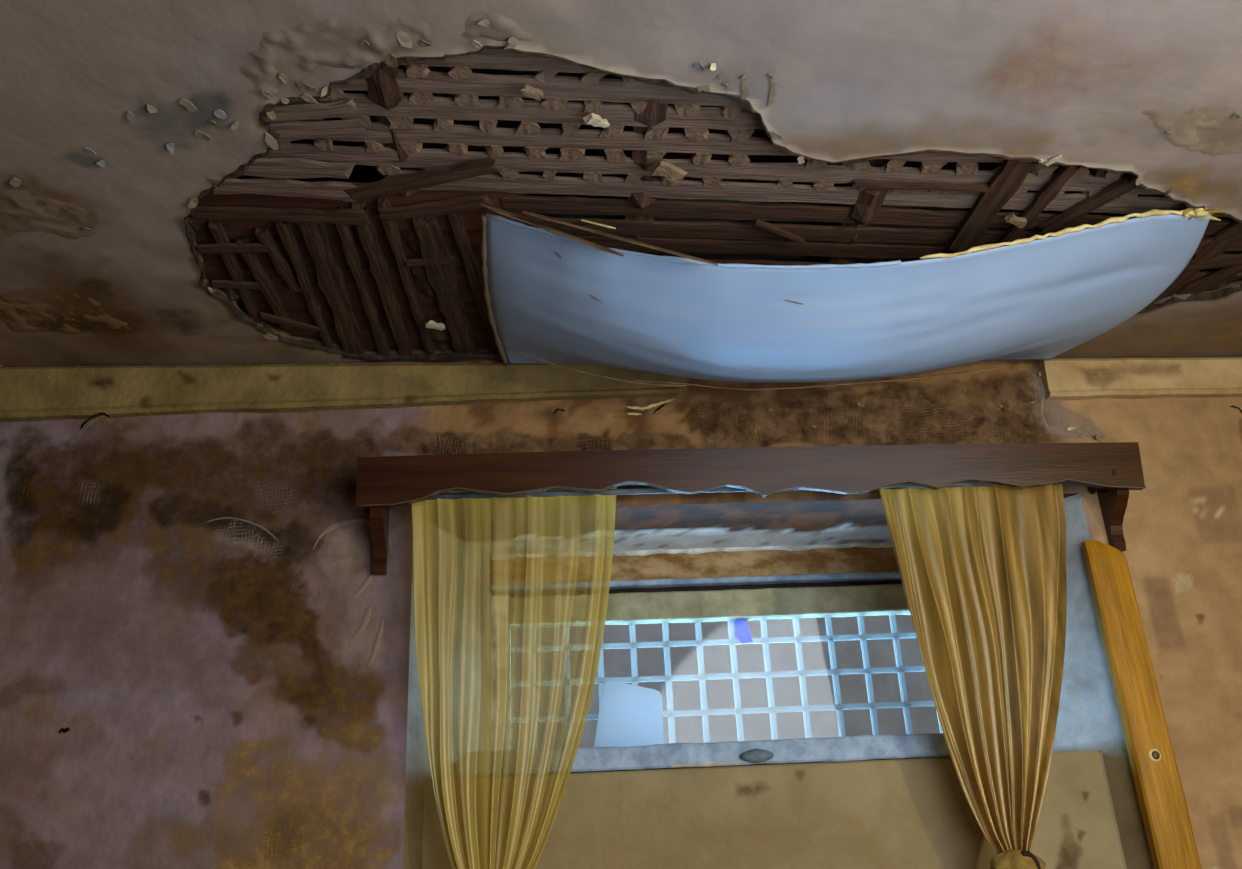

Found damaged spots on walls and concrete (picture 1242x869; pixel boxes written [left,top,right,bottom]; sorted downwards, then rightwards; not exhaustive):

peeling [177,16,1242,361]
water stain [6,424,691,869]